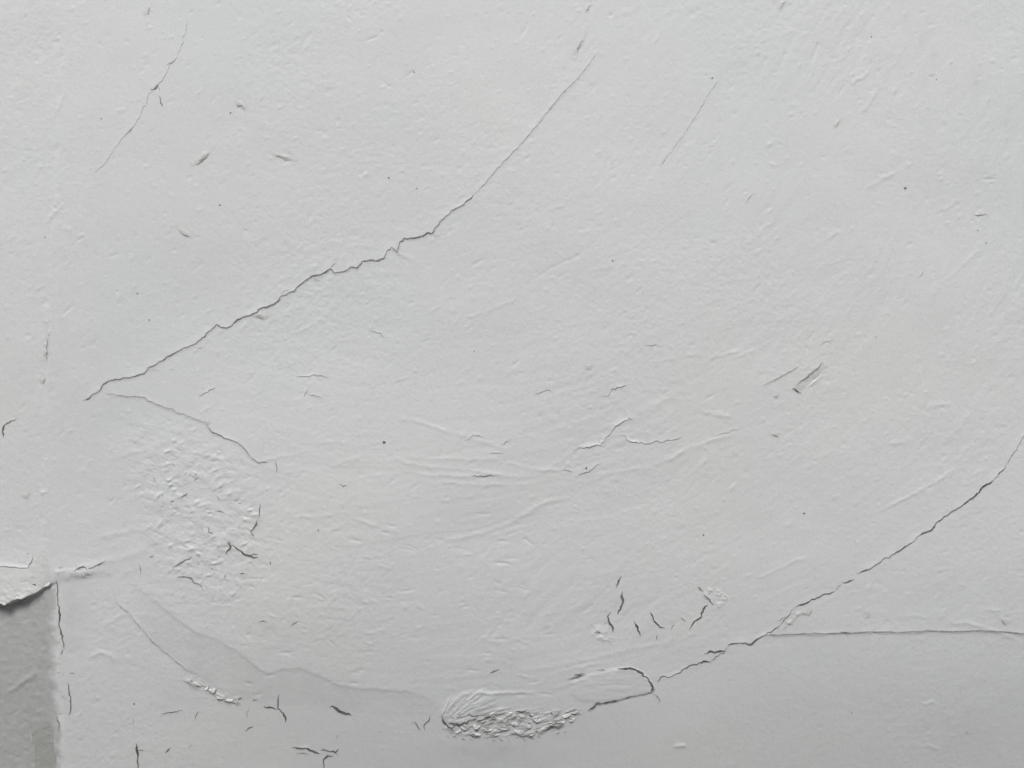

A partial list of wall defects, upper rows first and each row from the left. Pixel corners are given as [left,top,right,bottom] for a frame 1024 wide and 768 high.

crack [93,18,188,174]
crack [82,50,599,473]
flaking render [0,554,64,768]
peeling [441,665,659,741]
crack [604,576,708,640]
crack [657,428,1024,682]